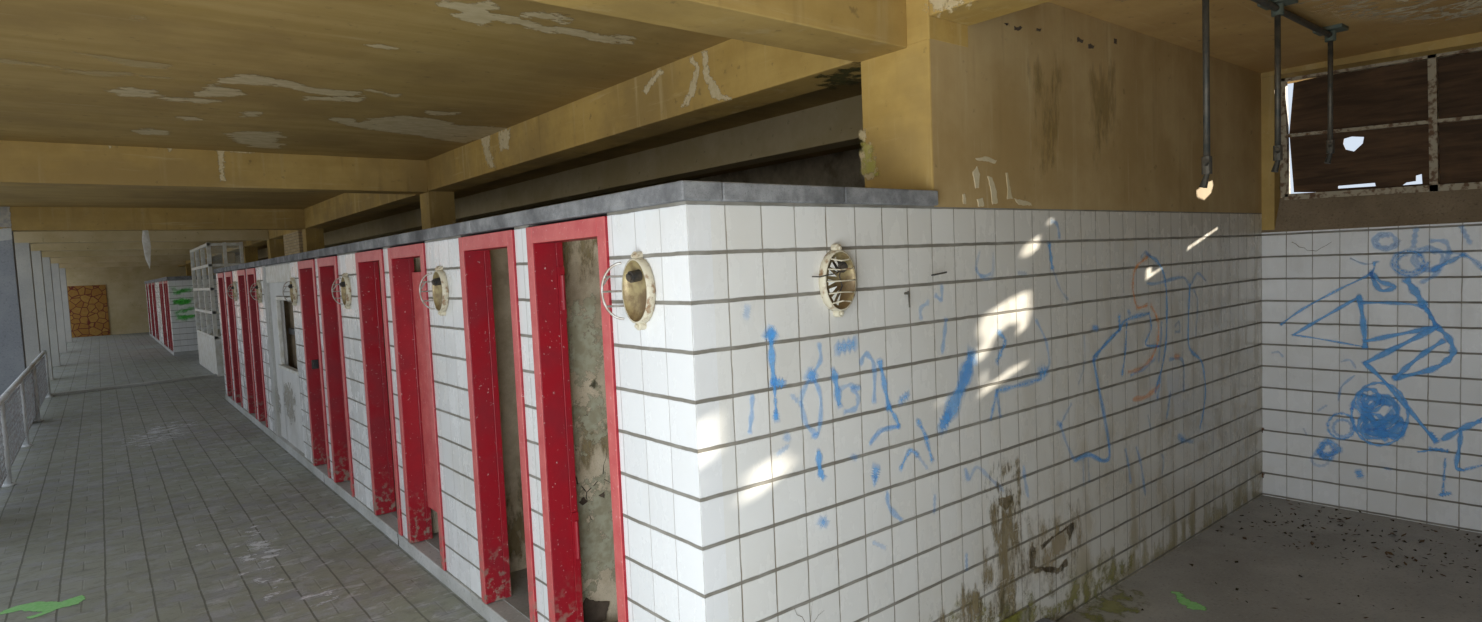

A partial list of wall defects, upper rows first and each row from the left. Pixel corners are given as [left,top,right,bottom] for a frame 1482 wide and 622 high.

peeling [435,0,637,44]
peeling [1308,0,1482,19]
peeling [103,74,507,149]
damp [940,470,1081,622]